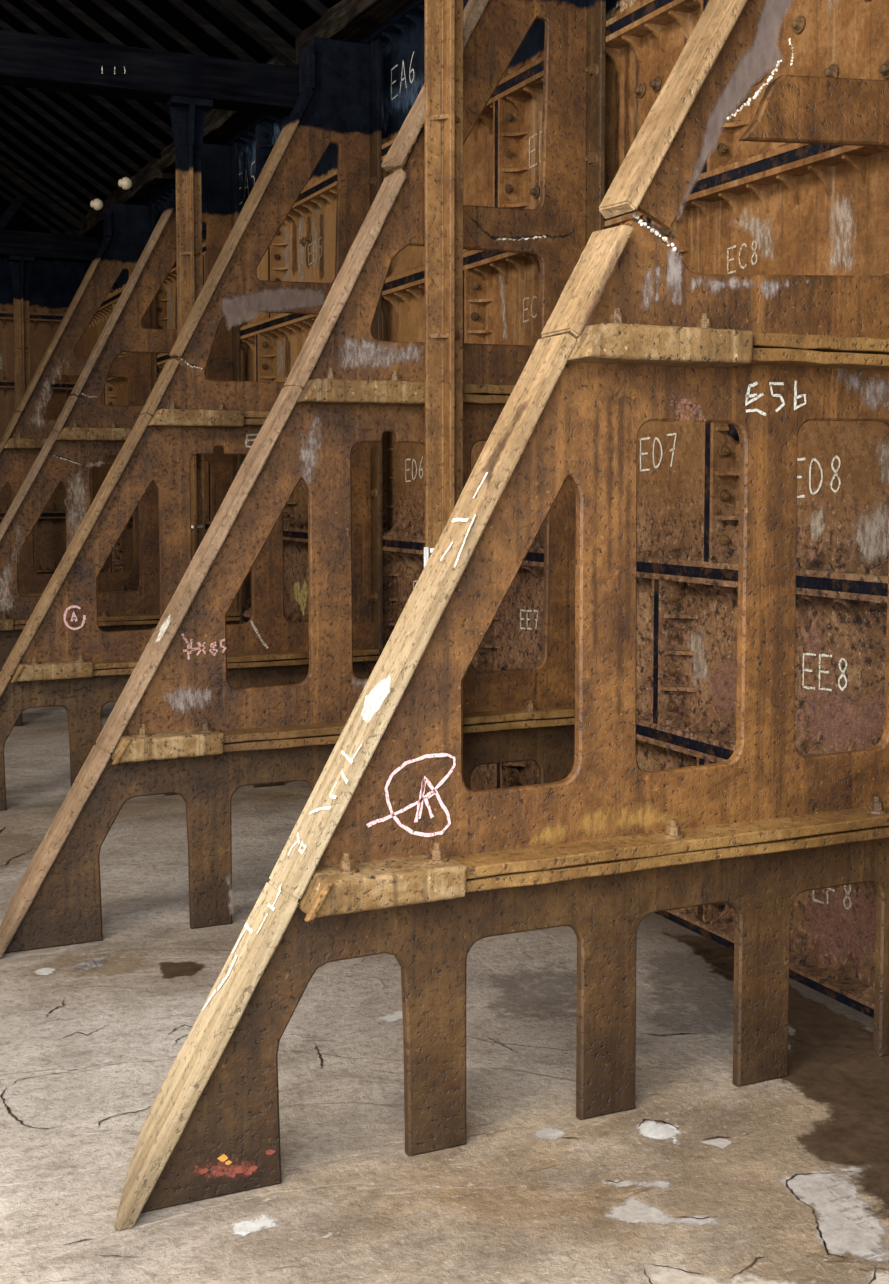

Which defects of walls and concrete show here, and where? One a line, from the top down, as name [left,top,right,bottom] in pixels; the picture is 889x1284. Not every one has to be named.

water stain [24,953,205,978]
crack [0,1000,120,1129]
water stain [780,984,889,1218]
crack [98,1106,151,1128]
spalling [637,1119,680,1144]
spalling [603,1180,718,1225]
spalling [781,1167,889,1284]
crack [652,1256,767,1278]
spalling [643,1263,797,1284]